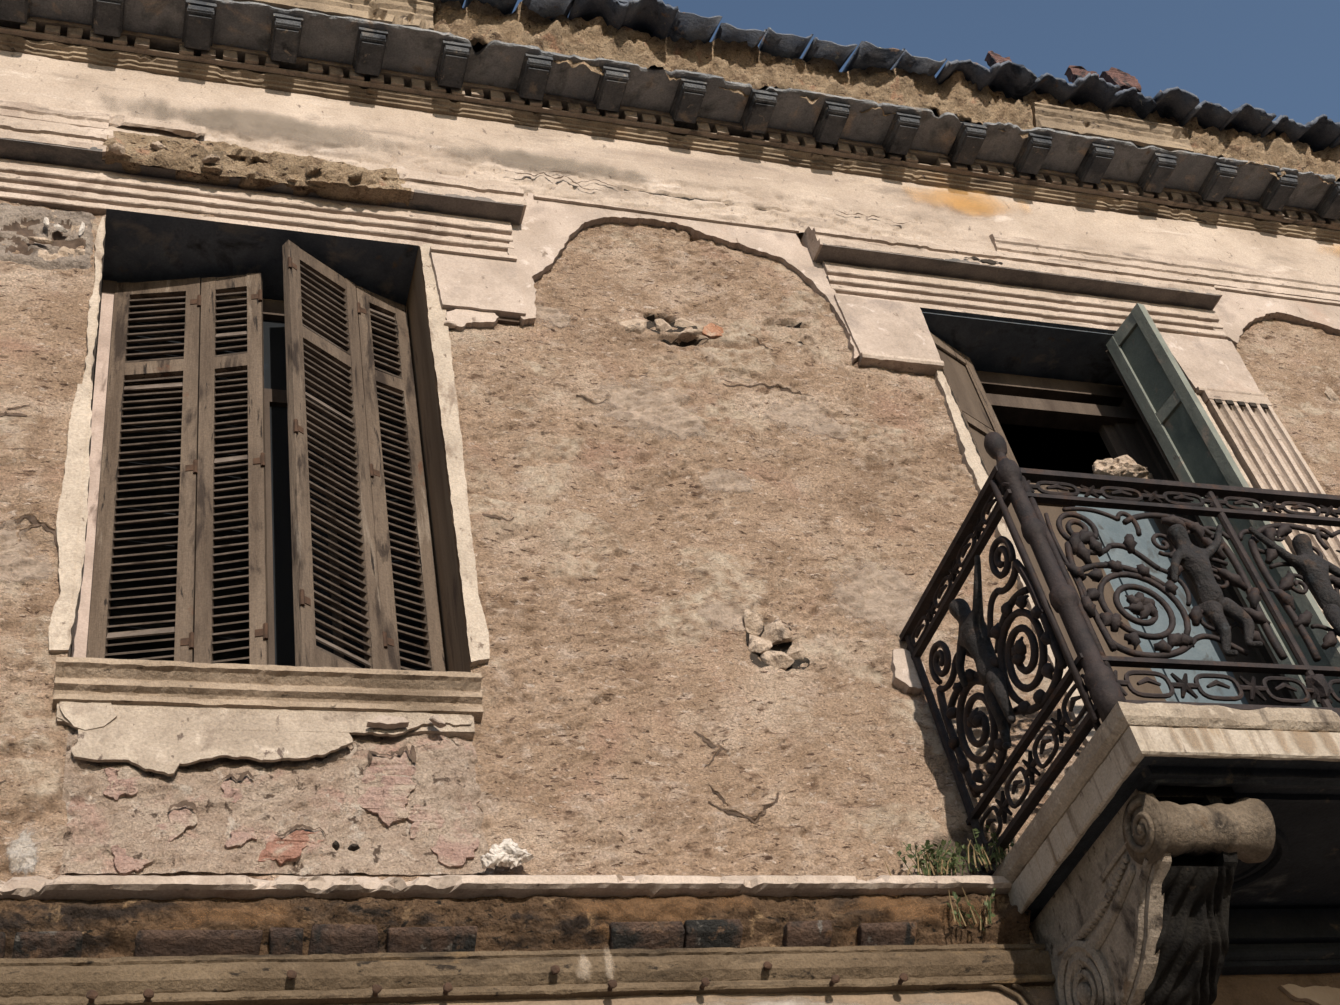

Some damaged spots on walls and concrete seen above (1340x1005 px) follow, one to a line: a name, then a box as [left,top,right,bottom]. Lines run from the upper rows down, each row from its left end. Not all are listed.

spalling [102,135,389,195]
spalling [0,203,96,270]
hole [619,315,724,347]
hole [743,609,810,670]
spalling [56,701,489,876]
spalling [0,894,1031,959]
damp [328,986,1053,1005]
peeling [1278,984,1340,1005]